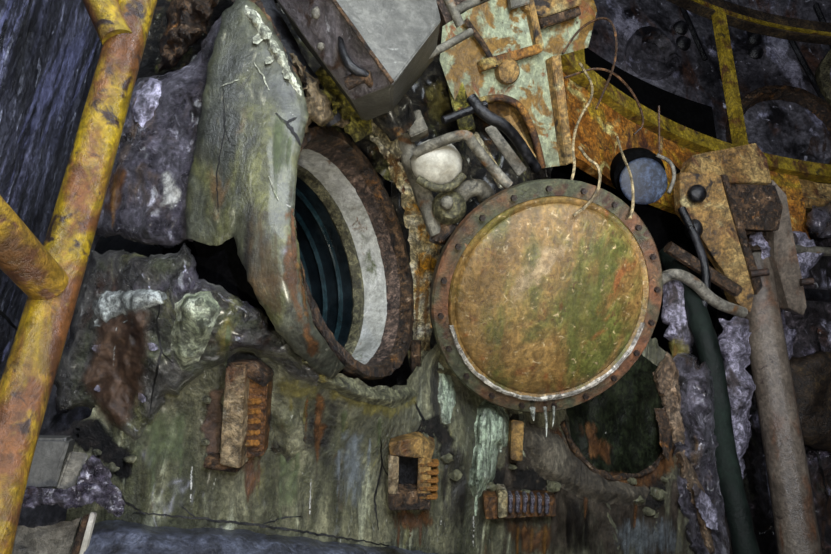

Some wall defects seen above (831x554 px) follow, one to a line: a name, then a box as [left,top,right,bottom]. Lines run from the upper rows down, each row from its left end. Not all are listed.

corrosion [243,379,273,499]